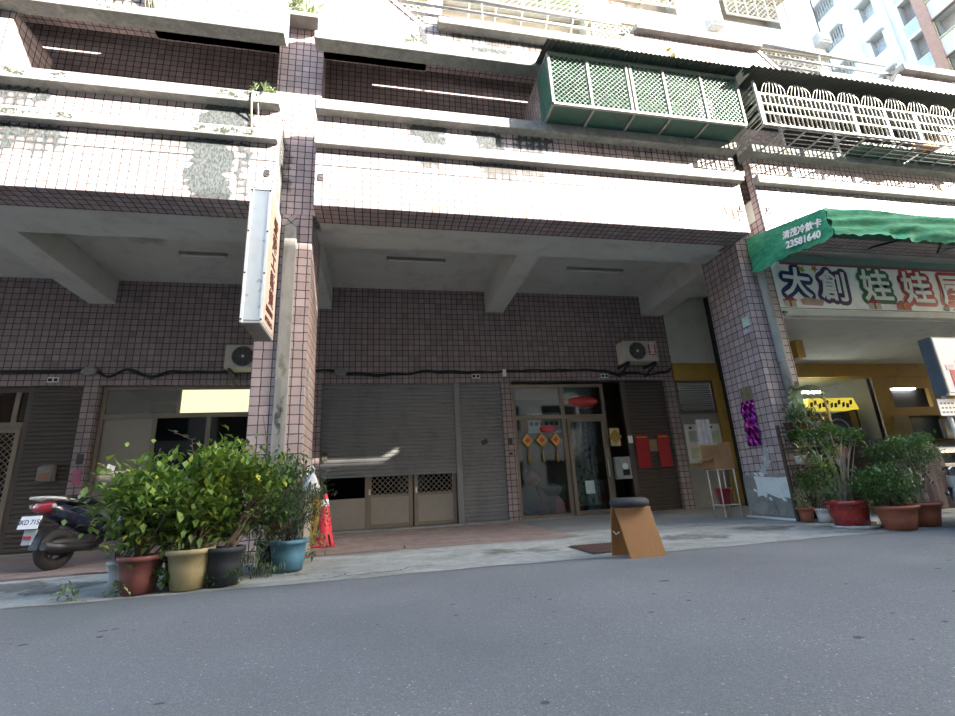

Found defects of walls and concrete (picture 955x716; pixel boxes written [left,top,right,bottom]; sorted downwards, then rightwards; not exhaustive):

peeling [753,472,791,502]